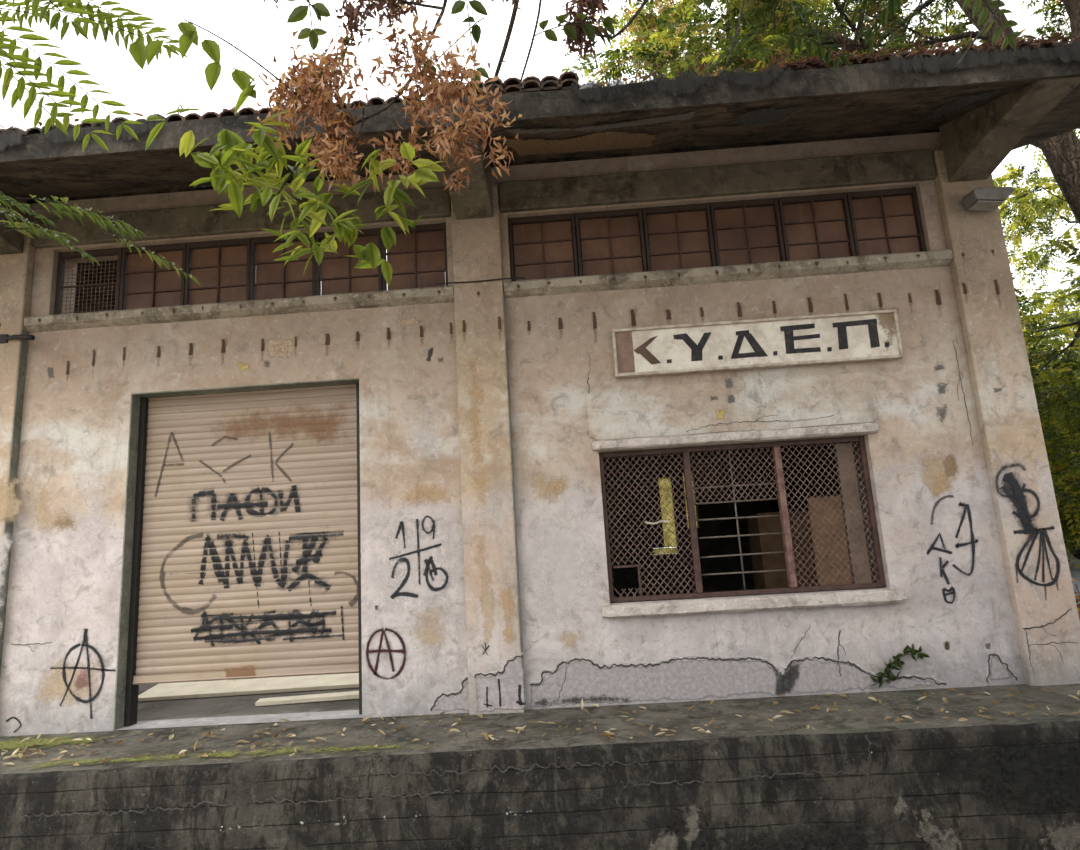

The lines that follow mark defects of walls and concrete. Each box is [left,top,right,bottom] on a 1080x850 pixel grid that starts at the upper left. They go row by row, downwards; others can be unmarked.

peeling [478,542,514,642]
flaking render [430,633,946,712]
crack [837,625,846,676]
crack [1023,608,1074,673]
water stain [642,802,713,850]